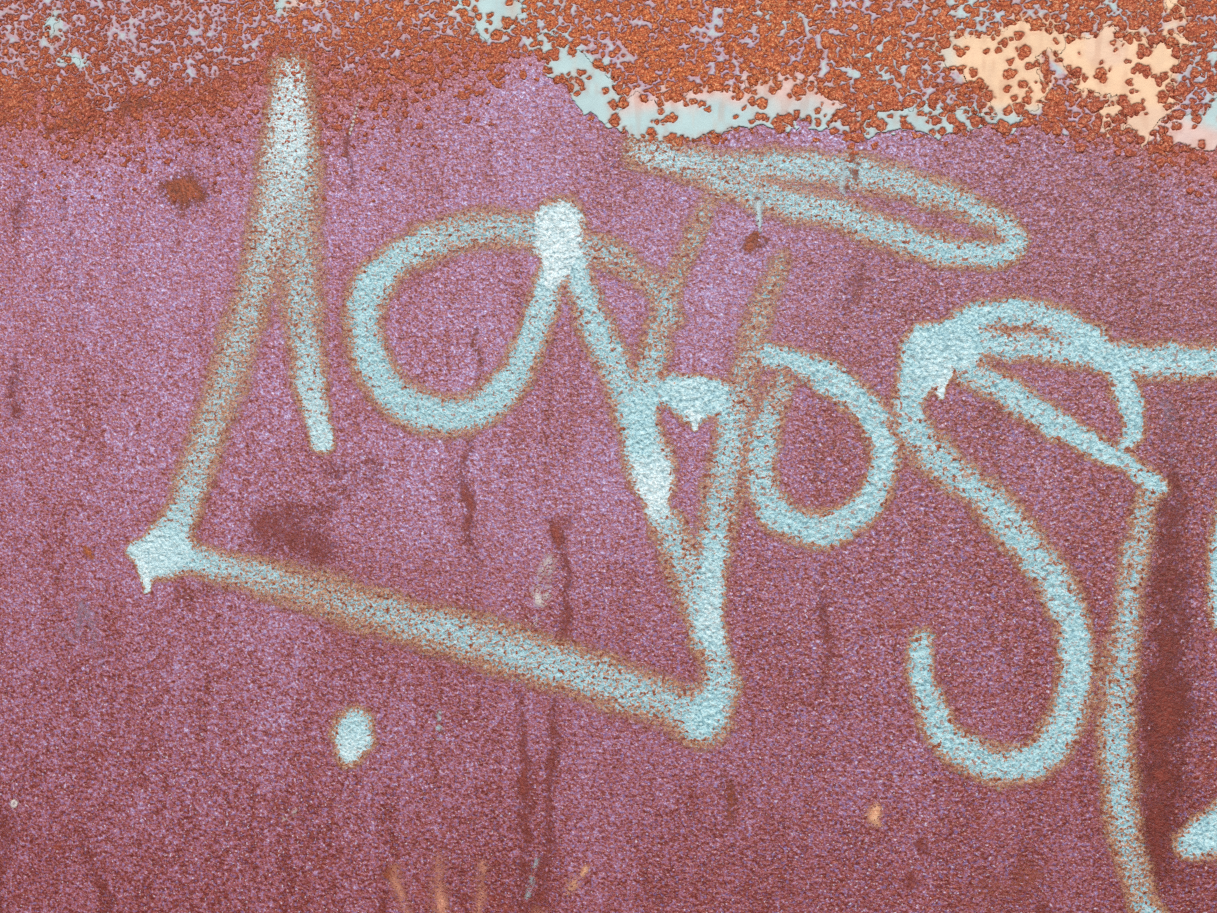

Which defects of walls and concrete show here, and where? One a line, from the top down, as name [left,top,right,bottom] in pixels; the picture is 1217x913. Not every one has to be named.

peeling [1166,0,1185,18]
rust [0,0,1217,218]
peeling [538,20,1217,154]